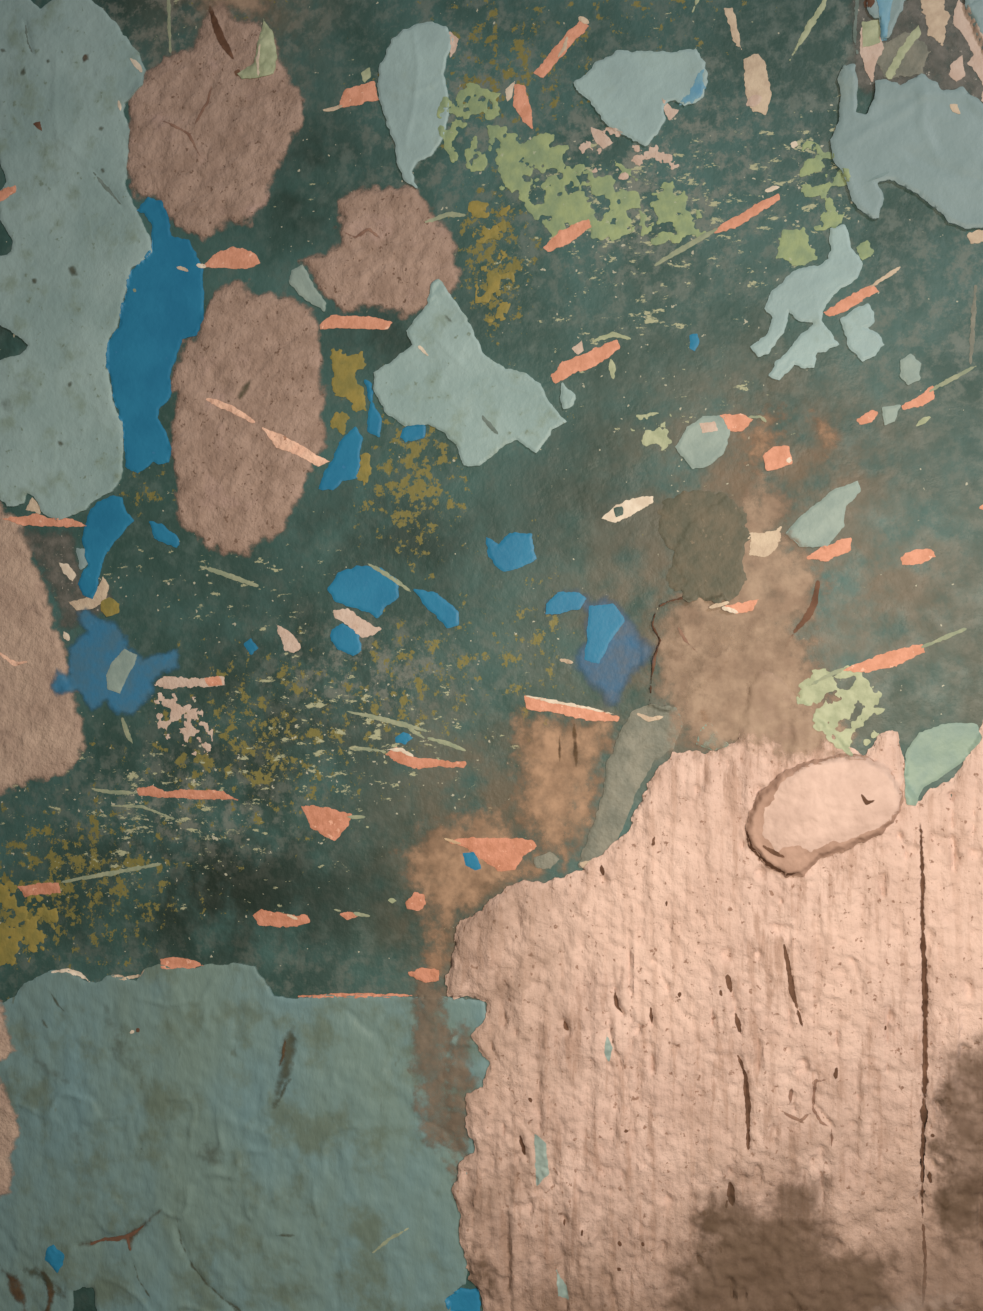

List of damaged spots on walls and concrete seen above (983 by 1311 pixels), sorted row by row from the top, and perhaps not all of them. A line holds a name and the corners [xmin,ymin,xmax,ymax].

peeling [574,49,708,173]
peeling [724,8,772,115]
peeling [789,0,983,244]
spalling [149,16,631,556]
peeling [750,224,900,381]
peeling [0,0,304,795]
peeling [748,481,861,562]
peeling [524,696,620,722]
spalling [0,721,983,1311]
crack [919,828,929,1303]
water stain [945,1057,983,1152]
water stain [685,1188,882,1311]